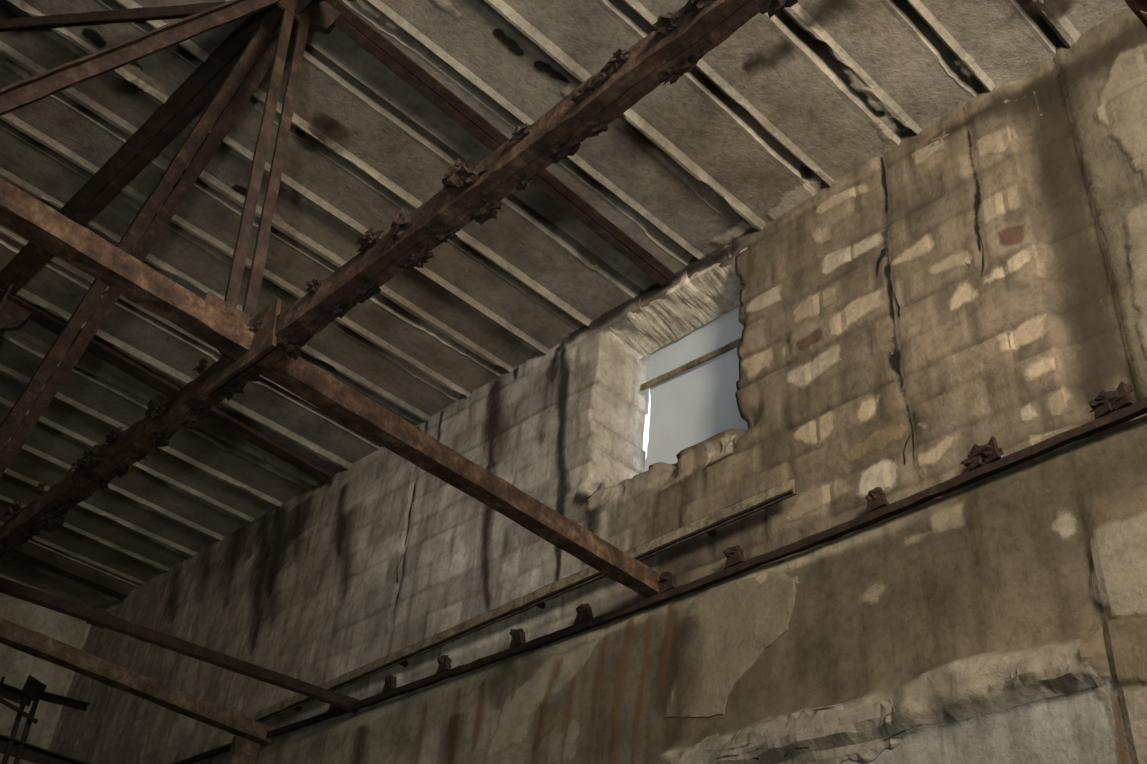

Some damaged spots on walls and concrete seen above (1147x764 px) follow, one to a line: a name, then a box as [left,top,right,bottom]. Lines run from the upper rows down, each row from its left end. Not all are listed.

crack [968,131,984,276]
crack [877,157,915,464]
water stain [486,378,502,473]
water stain [544,240,740,534]
water stain [228,499,309,651]
water stain [327,474,351,596]
water stain [481,505,491,608]
flaking render [665,571,798,718]
spalling [666,697,901,764]